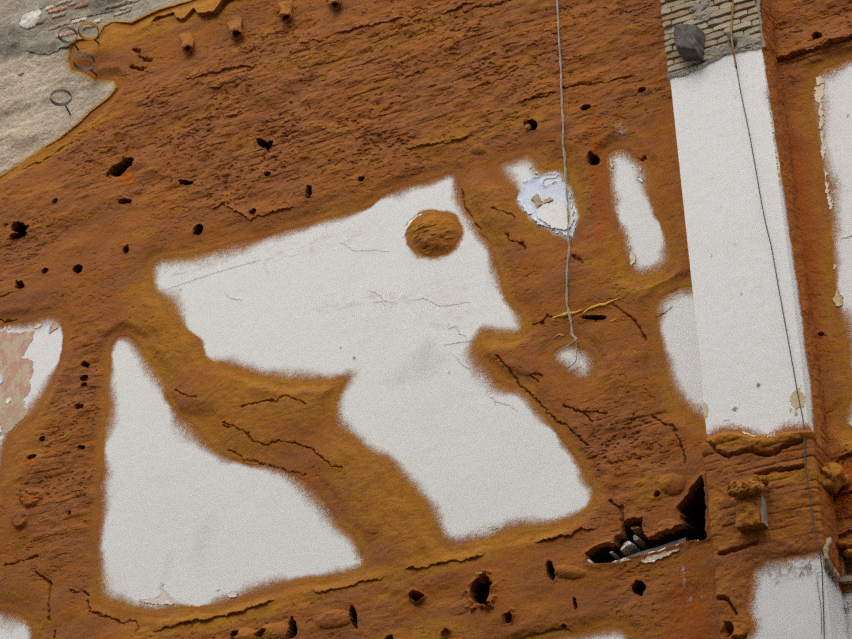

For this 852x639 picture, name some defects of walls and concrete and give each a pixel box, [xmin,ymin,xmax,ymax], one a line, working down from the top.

peeling [814,76,826,158]
peeling [517,167,576,238]
peeling [824,168,834,210]
peeling [0,321,58,435]
crack [222,393,344,476]
crack [4,553,141,639]